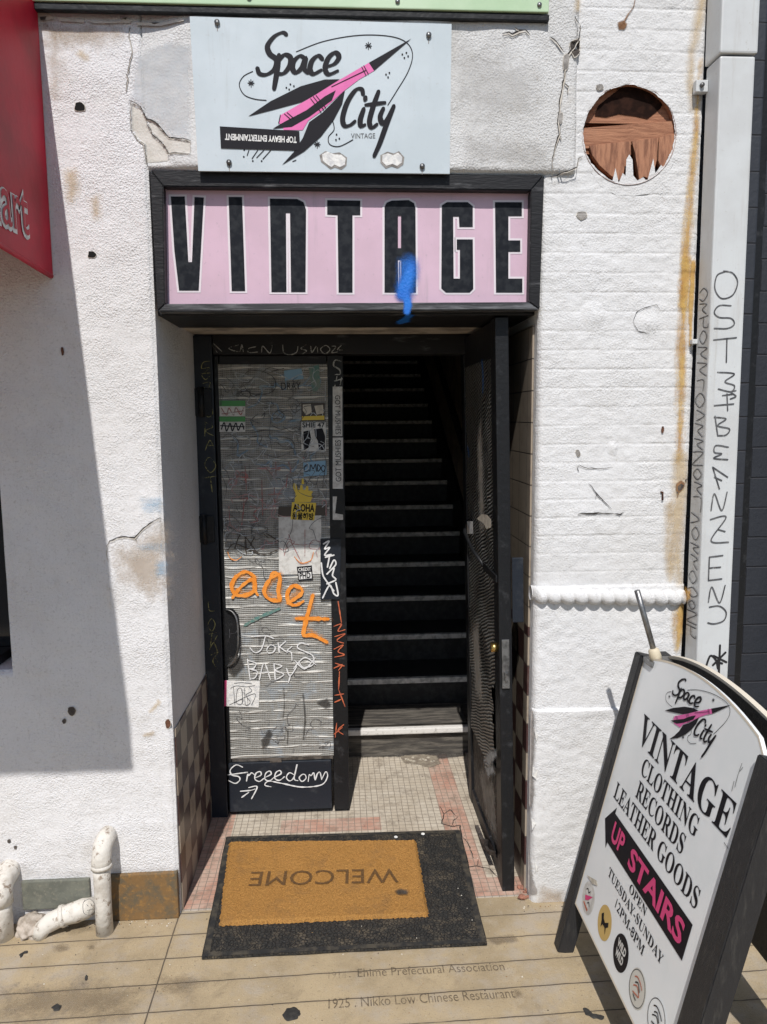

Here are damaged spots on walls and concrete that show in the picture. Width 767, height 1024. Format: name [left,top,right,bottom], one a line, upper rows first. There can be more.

crack [126,28,191,165]
flaking render [132,104,191,163]
crack [502,17,583,178]
rust [674,589,691,648]